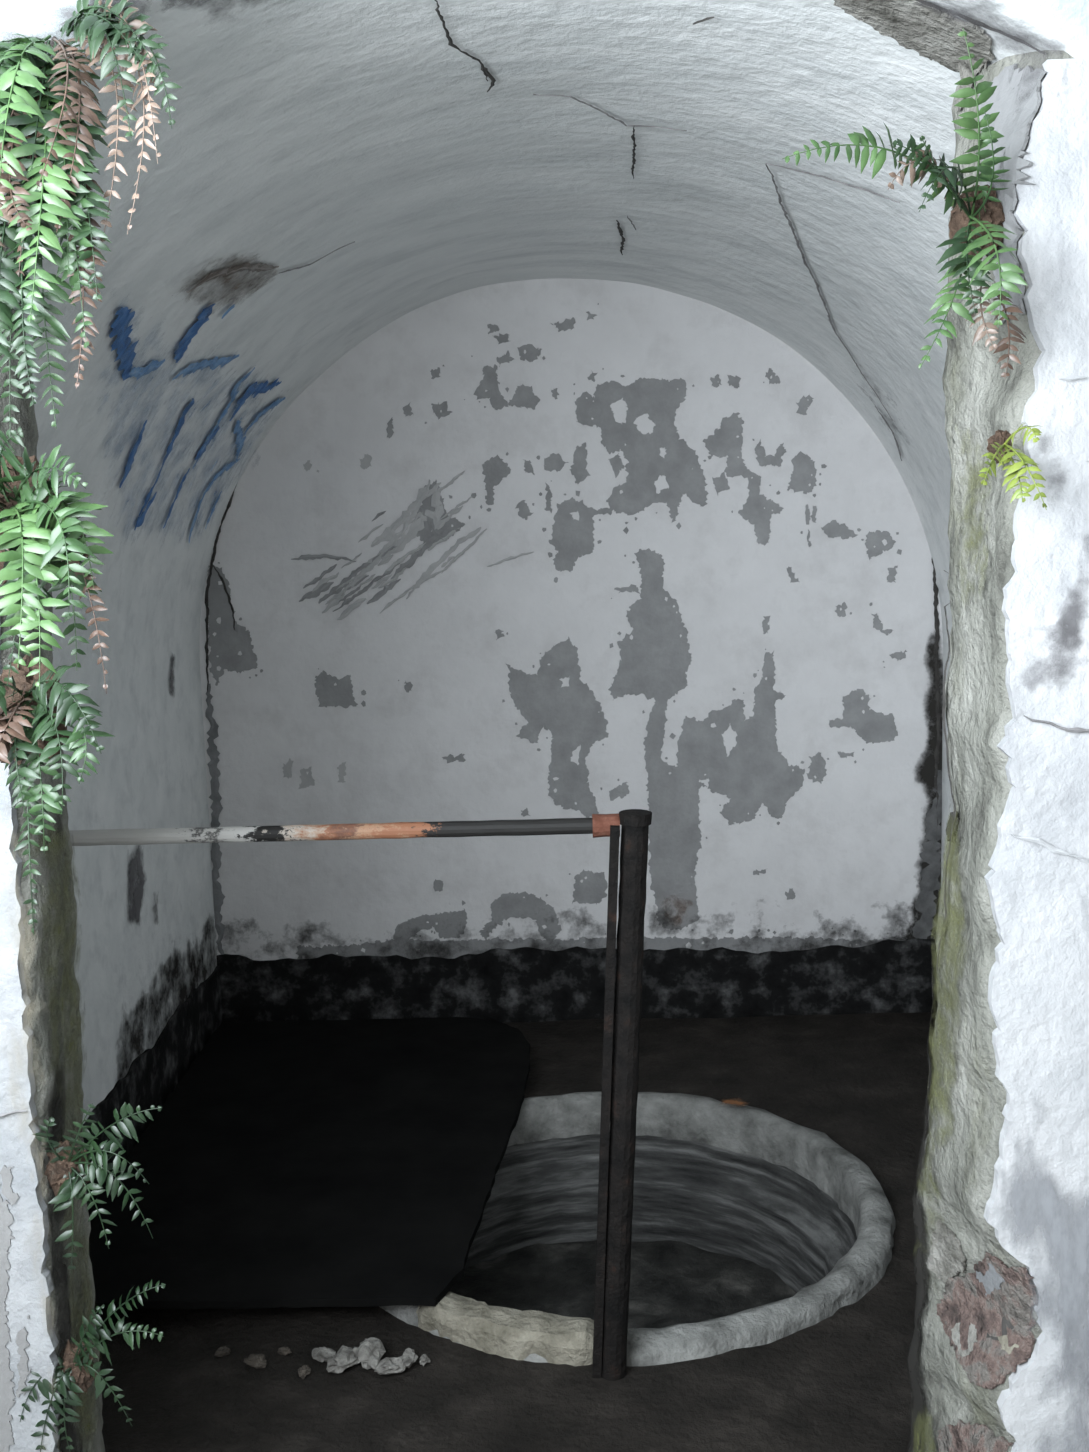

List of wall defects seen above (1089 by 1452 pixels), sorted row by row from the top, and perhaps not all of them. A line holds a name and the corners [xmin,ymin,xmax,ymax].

crack [435,0,496,92]
crack [533,94,687,179]
crack [616,216,636,255]
peeling [551,303,599,332]
crack [765,163,902,461]
peeling [386,324,902,583]
water stain [1048,590,1081,676]
peeling [502,548,907,954]
crack [1024,716,1089,733]
peeling [296,891,617,959]
peeling [0,1165,31,1452]
spalling [925,1219,1038,1389]